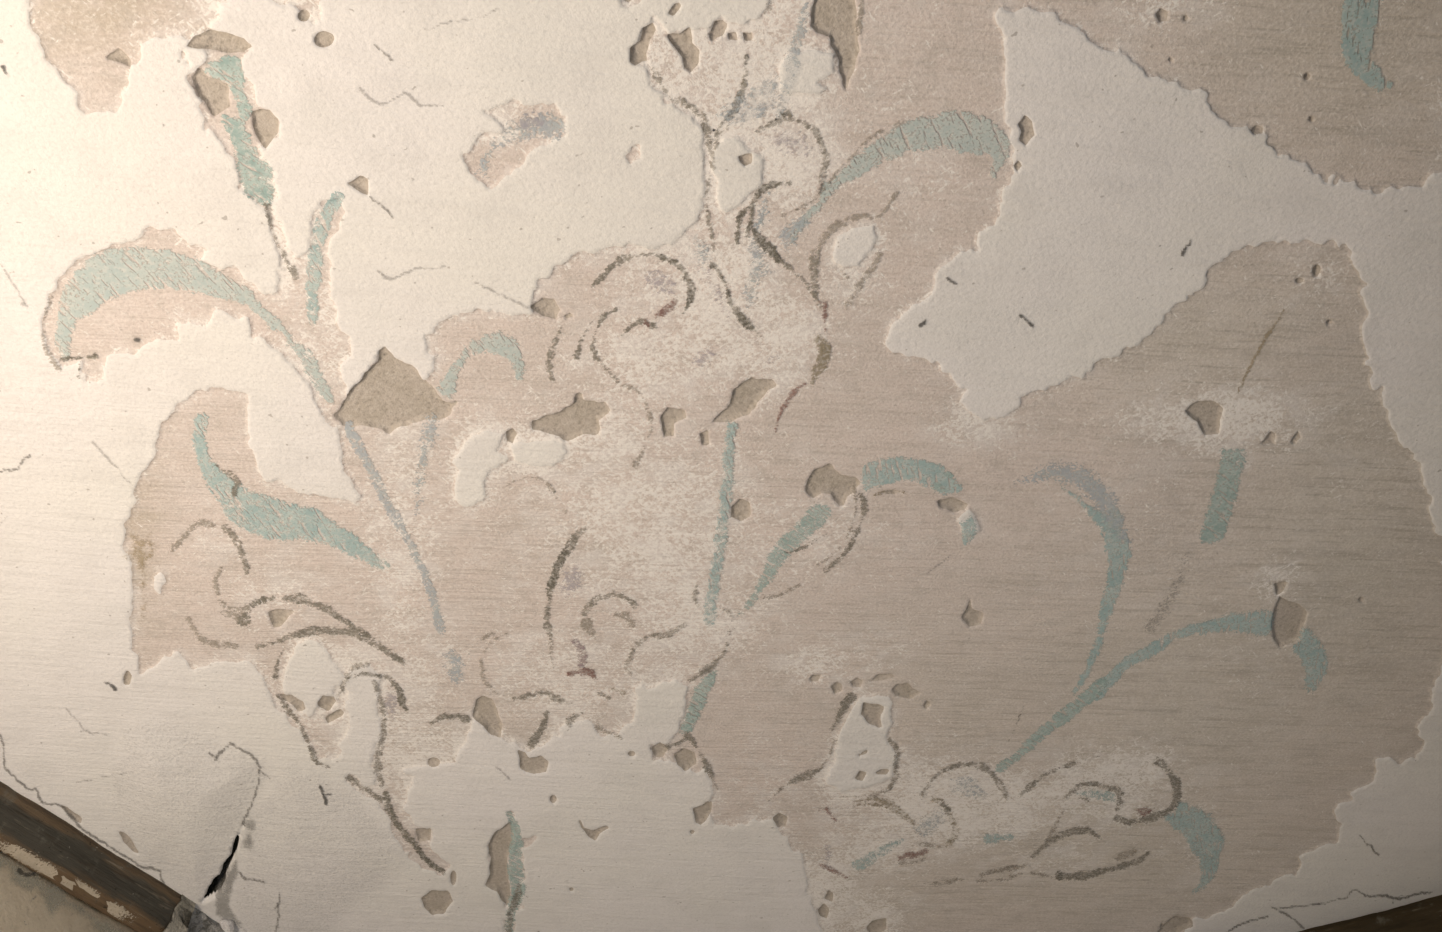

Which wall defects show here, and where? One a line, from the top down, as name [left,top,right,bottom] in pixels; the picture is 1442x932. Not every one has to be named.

spalling [630,23,656,65]
spalling [668,27,700,72]
spalling [811,0,860,89]
peeling [29,0,351,389]
peeling [712,138,763,213]
peeling [833,226,877,267]
spalling [334,347,457,434]
peeling [452,431,506,507]
peeling [511,440,567,466]
peeling [826,695,897,792]
crack [0,736,164,884]
crack [204,742,280,921]